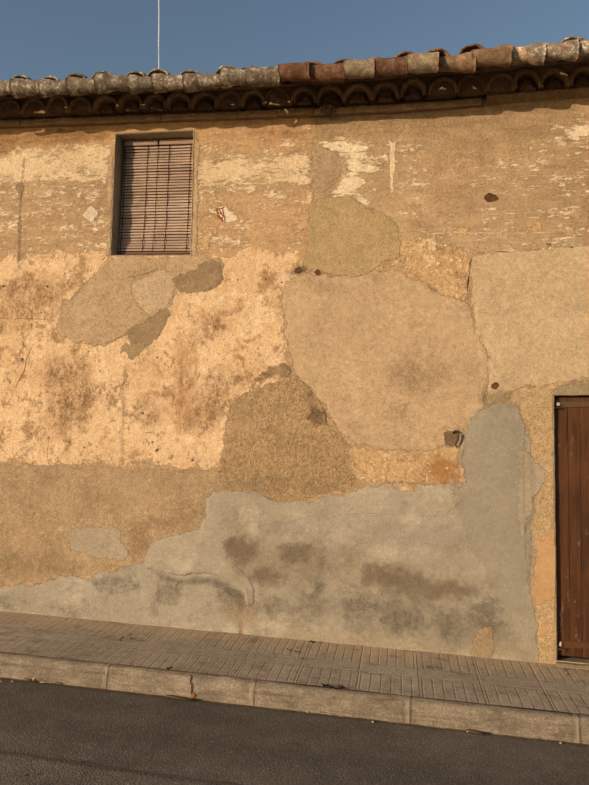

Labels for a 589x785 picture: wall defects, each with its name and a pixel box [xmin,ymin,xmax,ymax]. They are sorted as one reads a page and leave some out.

peeling [319,136,387,205]
peeling [548,121,589,158]
peeling [0,132,315,471]
peeling [371,233,493,301]
crack [413,255,478,316]
peeling [352,433,466,494]